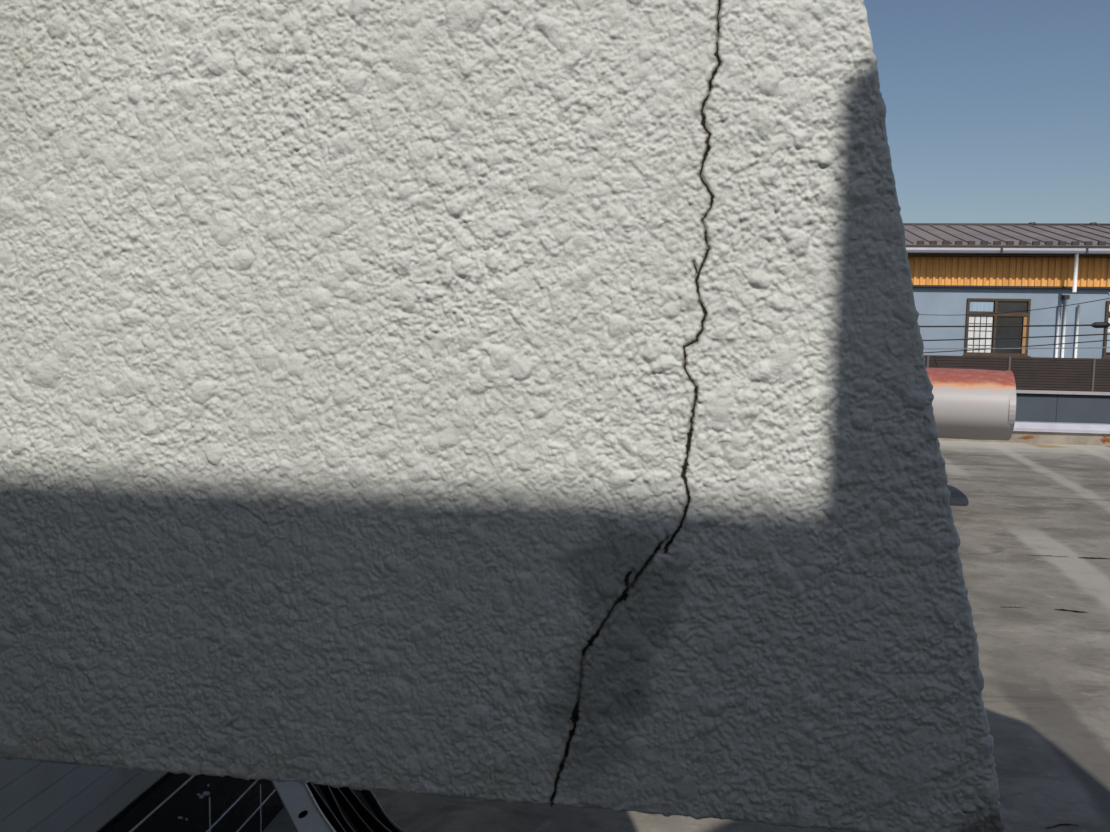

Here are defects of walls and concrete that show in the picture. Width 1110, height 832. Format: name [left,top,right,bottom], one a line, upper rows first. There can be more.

crack [550,0,721,807]